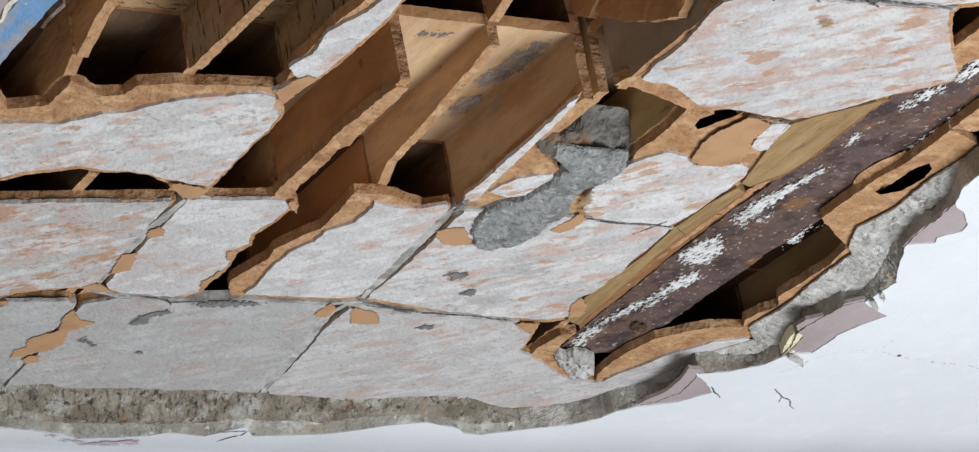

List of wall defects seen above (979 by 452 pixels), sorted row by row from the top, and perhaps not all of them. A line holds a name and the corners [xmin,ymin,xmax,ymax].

crack [846,0,950,9]
spalling [275,75,316,103]
peeling [899,59,979,113]
spalling [691,117,771,167]
crack [119,295,247,305]
flaking render [0,146,979,438]